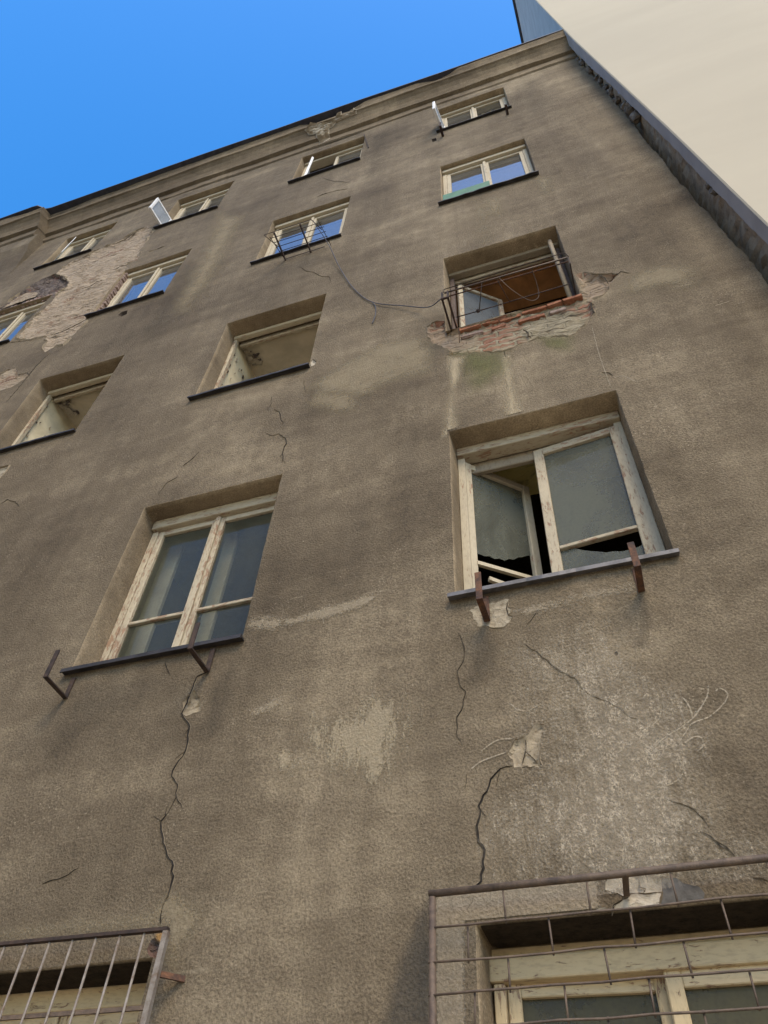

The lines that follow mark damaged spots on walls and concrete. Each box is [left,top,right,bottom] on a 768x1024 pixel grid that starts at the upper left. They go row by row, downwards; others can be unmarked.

peeling [0,226,156,352]
flaking render [426,272,618,357]
peeling [0,368,28,390]
crack [266,397,287,462]
peeling [469,584,633,629]
crack [456,634,466,745]
crack [506,602,645,726]
crack [154,662,211,924]
crack [465,739,536,906]
crack [666,798,735,856]
flaking render [597,876,662,910]